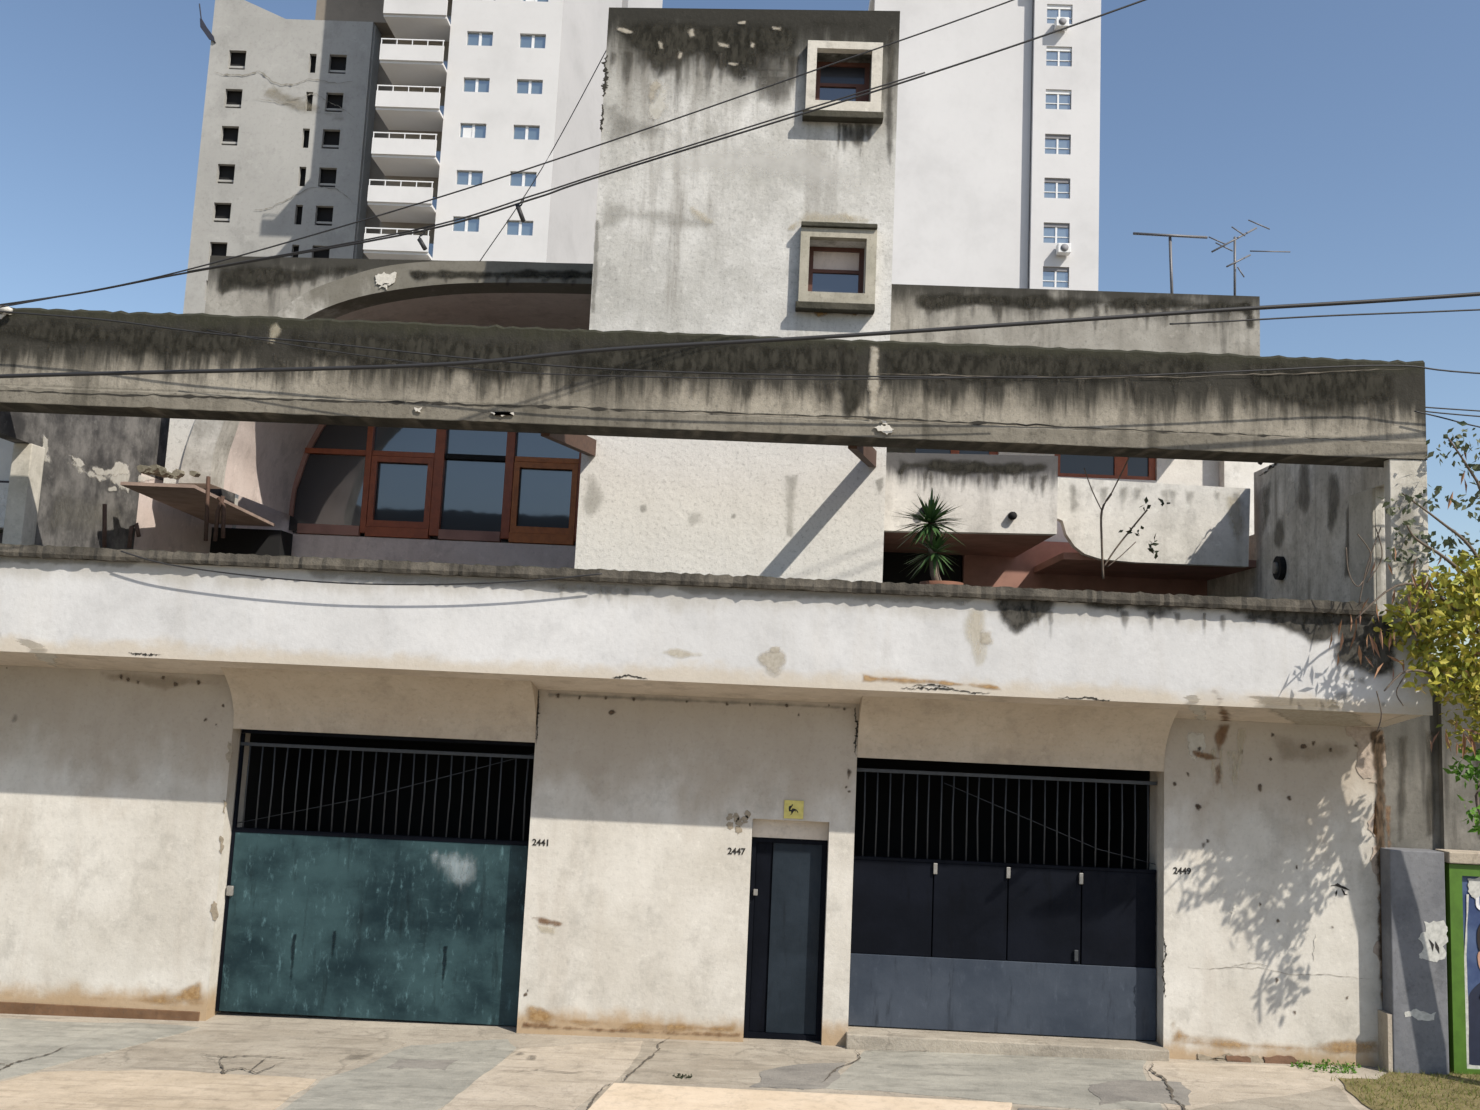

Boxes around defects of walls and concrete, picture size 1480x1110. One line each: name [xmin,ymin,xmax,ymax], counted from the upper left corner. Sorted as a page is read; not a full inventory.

water stain [625,24,798,97]
crack [217,71,355,118]
water stain [838,31,894,150]
water stain [917,294,1254,328]
water stain [294,334,544,384]
water stain [569,341,1208,423]
water stain [1246,364,1395,410]
water stain [997,599,1053,632]
water stain [1087,603,1179,619]
water stain [1231,609,1395,675]
corrosion [1185,695,1229,783]
water stain [152,984,200,1003]